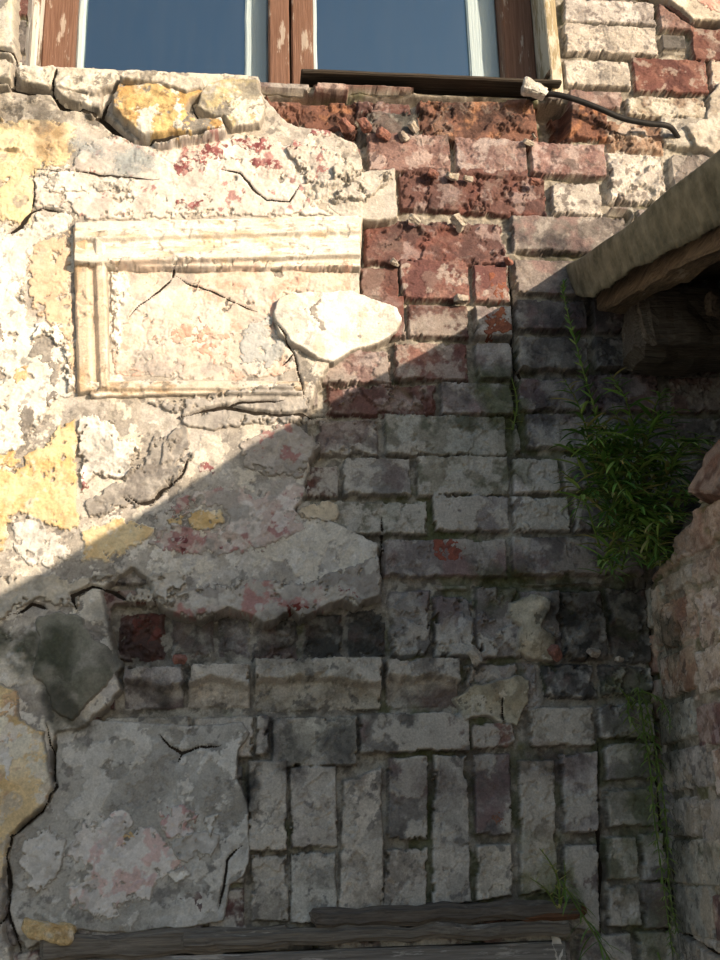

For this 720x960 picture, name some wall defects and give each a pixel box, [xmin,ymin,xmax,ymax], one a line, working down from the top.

crack [0,50,179,147]
crack [222,169,300,203]
crack [130,269,323,420]
peeling [0,89,669,455]
peeling [0,256,353,620]
spalling [95,556,658,722]
crack [161,736,219,762]
crack [0,725,59,951]
peeling [18,804,220,922]